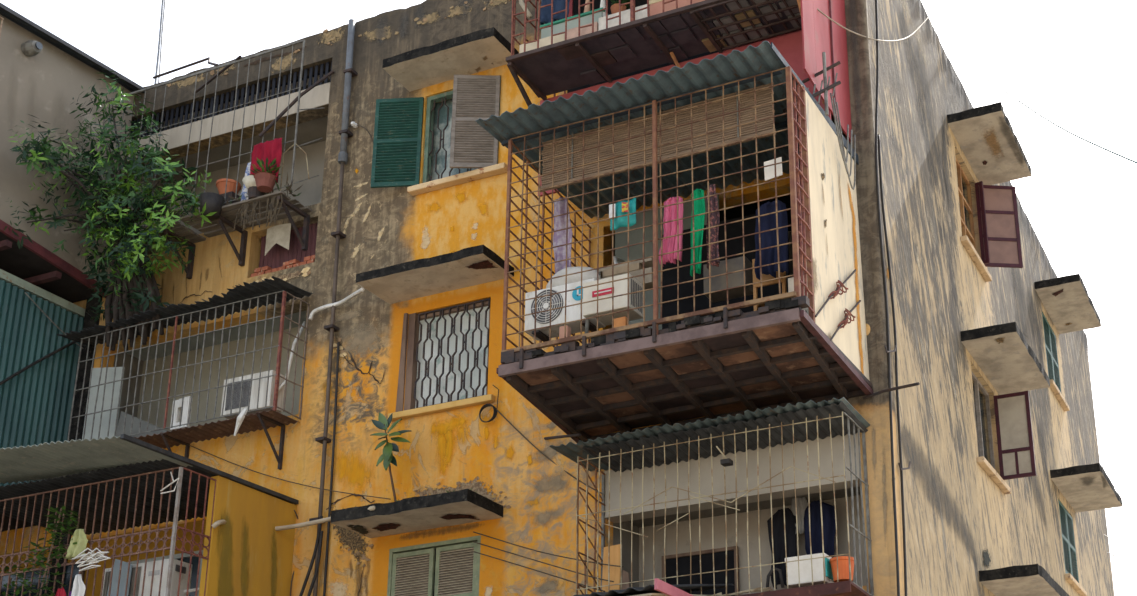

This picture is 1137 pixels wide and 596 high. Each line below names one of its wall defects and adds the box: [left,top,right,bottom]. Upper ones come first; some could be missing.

peeling [414,0,510,24]
peeling [318,27,345,45]
peeling [358,26,399,41]
damp [900,16,949,199]
rust [839,177,864,374]
spalling [404,477,511,509]
damp [347,525,370,534]